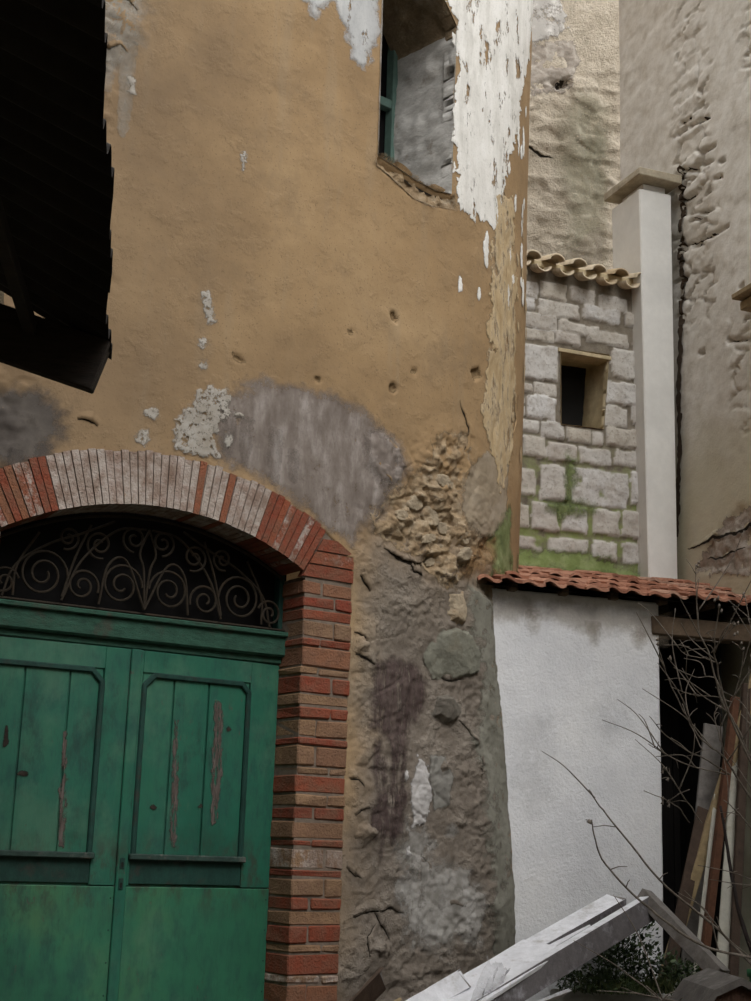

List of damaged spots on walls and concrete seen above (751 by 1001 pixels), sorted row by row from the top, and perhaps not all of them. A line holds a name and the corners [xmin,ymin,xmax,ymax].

crack [529,143,553,158]
flaking render [172,0,581,680]
leakage [0,390,65,465]
flaking render [134,407,159,447]
crack [688,522,751,560]
crack [349,771,375,839]
flaking render [405,754,433,828]
leakage [371,659,488,948]
crack [346,862,409,957]